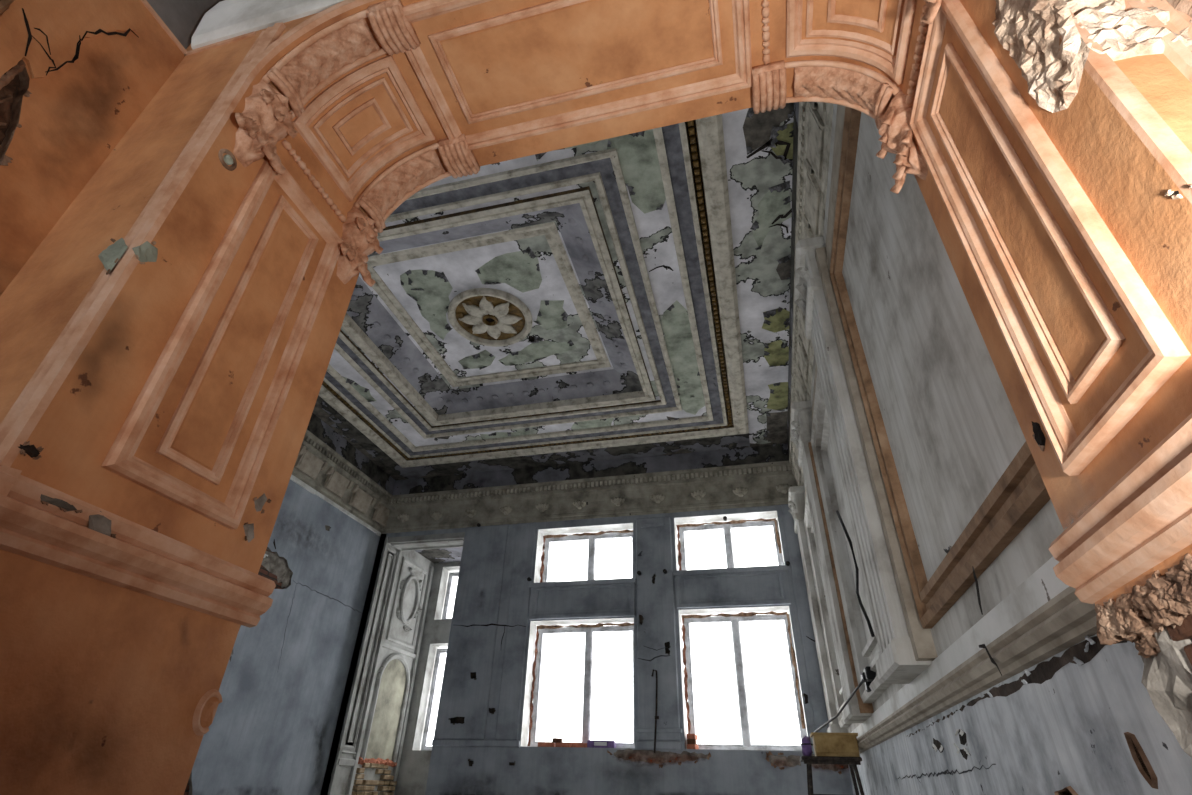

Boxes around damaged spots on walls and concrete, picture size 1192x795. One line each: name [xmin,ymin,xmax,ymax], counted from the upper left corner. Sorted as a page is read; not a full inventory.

peeling [0,0,138,90]
crack [22,8,139,76]
flaking render [992,0,1192,113]
peeling [535,129,666,214]
peeling [743,102,794,251]
peeling [400,270,453,340]
peeling [458,247,577,370]
peeling [762,307,790,367]
peeling [719,382,788,450]
flaking render [1032,421,1046,451]
flaking render [907,553,1192,760]
spalling [1124,732,1158,789]